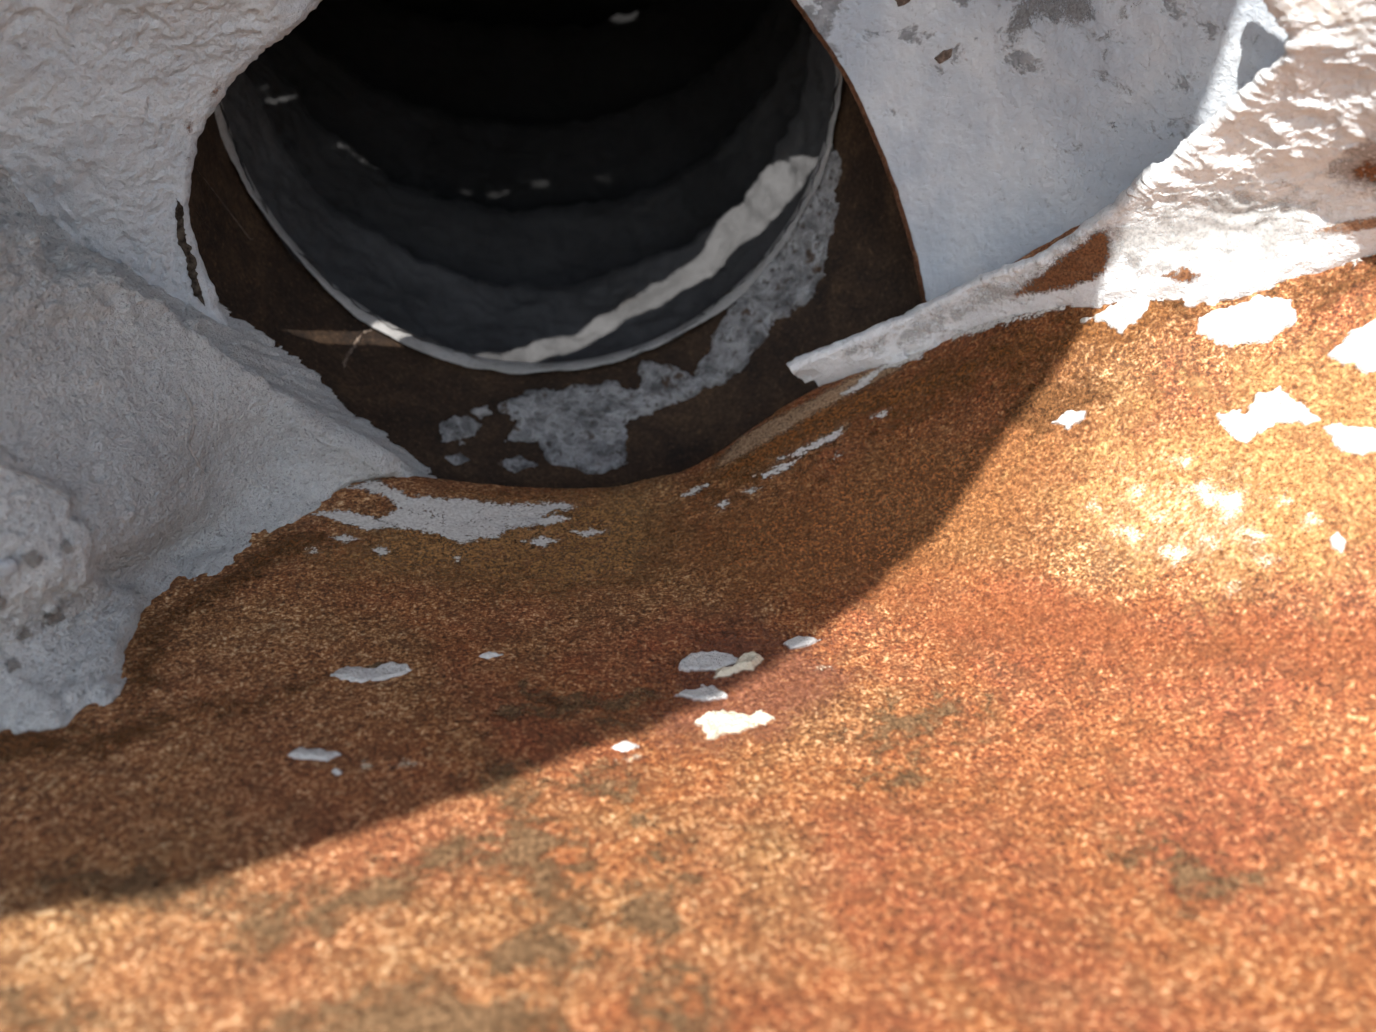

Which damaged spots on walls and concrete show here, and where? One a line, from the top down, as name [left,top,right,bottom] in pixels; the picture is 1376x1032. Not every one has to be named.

crack [175,164,252,306]
peeling [439,143,842,474]
peeling [1080,296,1151,335]
rust [1161,266,1201,284]
peeling [1196,294,1297,348]
peeling [1327,318,1376,376]
rust [686,299,1376,603]
peeling [1051,410,1087,431]
peeling [1216,385,1376,457]
peeling [305,479,606,562]
rust [306,490,670,594]
peeling [674,650,775,740]